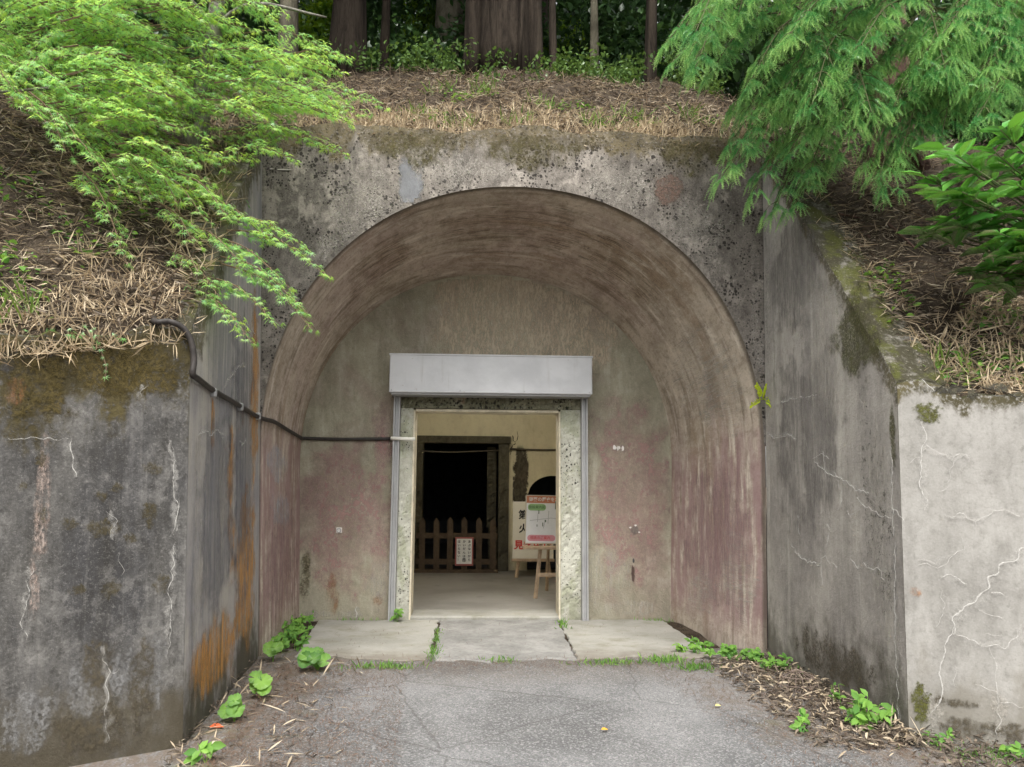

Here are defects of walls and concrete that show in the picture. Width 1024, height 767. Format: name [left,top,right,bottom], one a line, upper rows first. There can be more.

rust [192,310,259,698]
damp [795,625,876,693]
crack [791,424,1024,735]